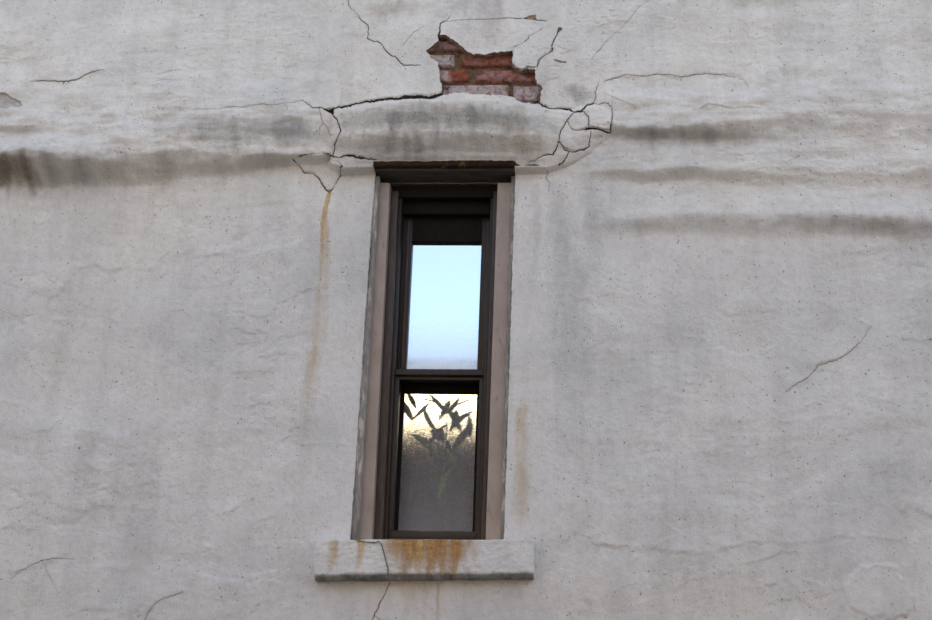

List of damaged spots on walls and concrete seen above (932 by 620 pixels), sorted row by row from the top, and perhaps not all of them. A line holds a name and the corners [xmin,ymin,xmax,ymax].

crack [31,69,102,84]
crack [348,0,559,66]
spalling [426,14,566,105]
crack [194,93,443,193]
crack [786,328,870,392]
crack [355,539,390,620]
corrosion [388,539,465,572]